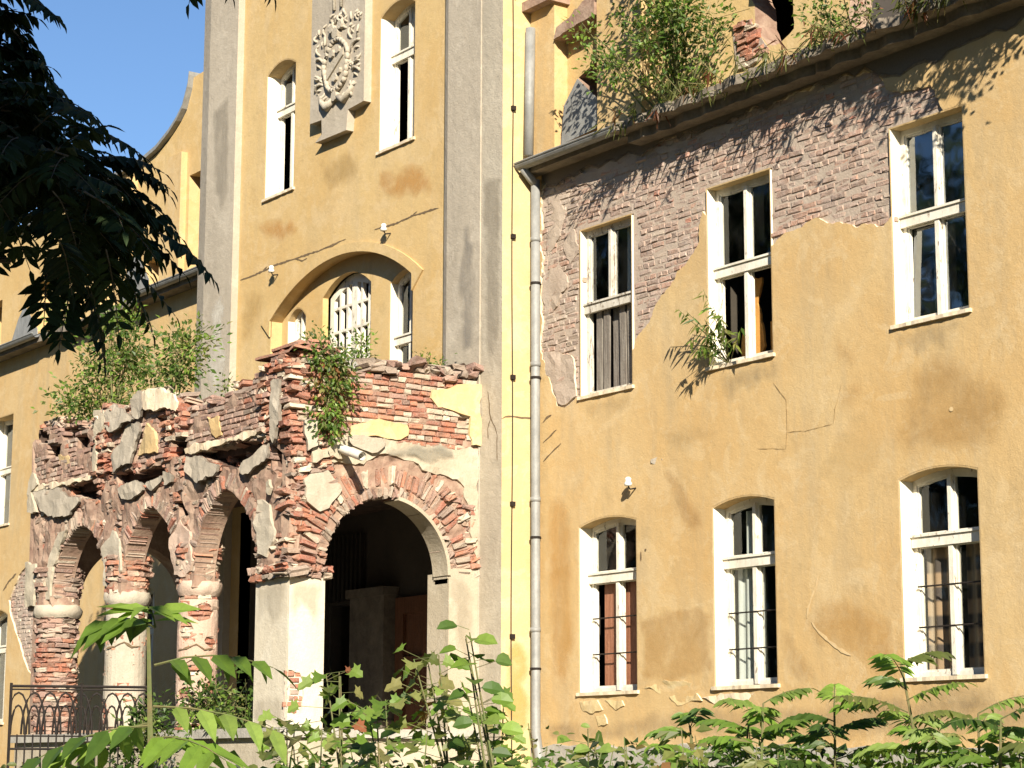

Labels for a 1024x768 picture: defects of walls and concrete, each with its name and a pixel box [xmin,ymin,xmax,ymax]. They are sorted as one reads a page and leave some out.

flaking render [540,72,943,408]
peeling [208,300,225,389]
crack [757,383,842,449]
flaking render [27,379,283,557]
flaking render [303,384,482,564]
flaking render [10,530,68,672]
flaking render [101,530,123,587]
flaking render [169,504,194,577]
flaking render [644,680,754,706]